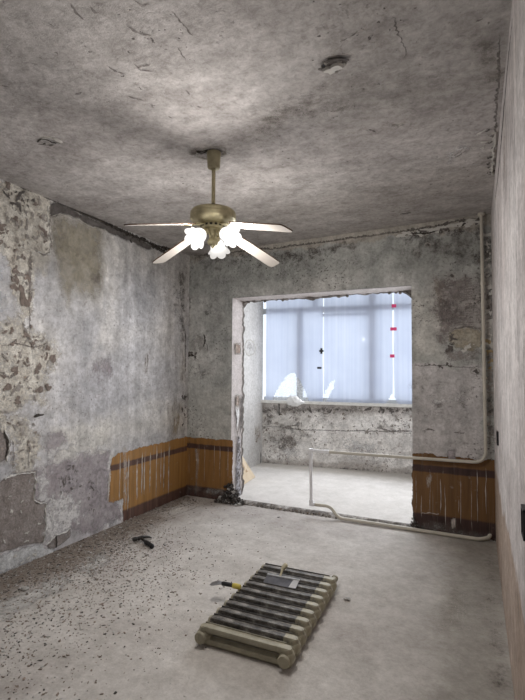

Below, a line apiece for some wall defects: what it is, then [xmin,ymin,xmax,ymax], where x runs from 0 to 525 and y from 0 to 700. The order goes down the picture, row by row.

spalling [318,58,349,75]
peeling [0,180,152,553]
water stain [52,217,102,296]
water stain [433,228,494,444]